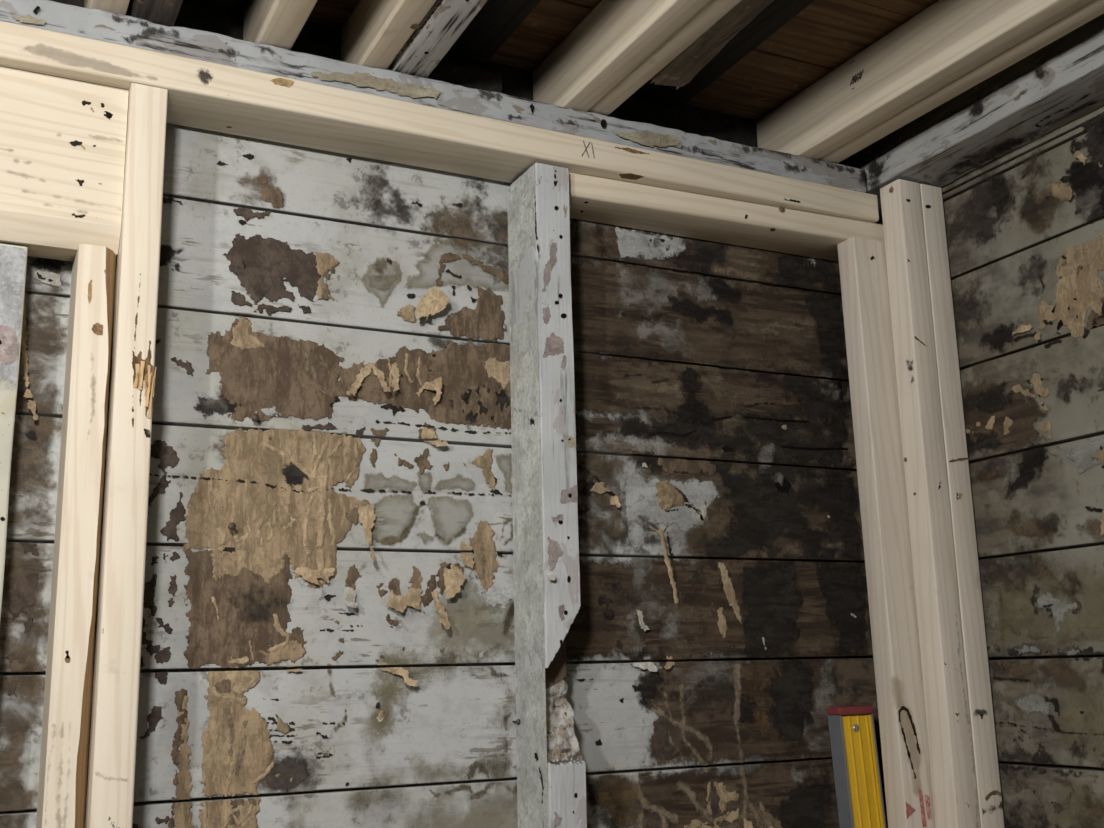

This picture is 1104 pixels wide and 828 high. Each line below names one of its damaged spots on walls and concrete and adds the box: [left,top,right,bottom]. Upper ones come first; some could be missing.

leakage [361,166,411,223]
leakage [938,137,1062,243]
leakage [1066,112,1104,224]
leakage [362,199,509,306]
peeling [206,172,511,474]
leakage [952,282,1014,352]
peeling [463,449,502,495]
leakage [576,449,629,554]
peeling [630,451,738,550]
peeling [320,565,363,661]
peeling [376,521,503,629]
spalling [263,714,297,745]